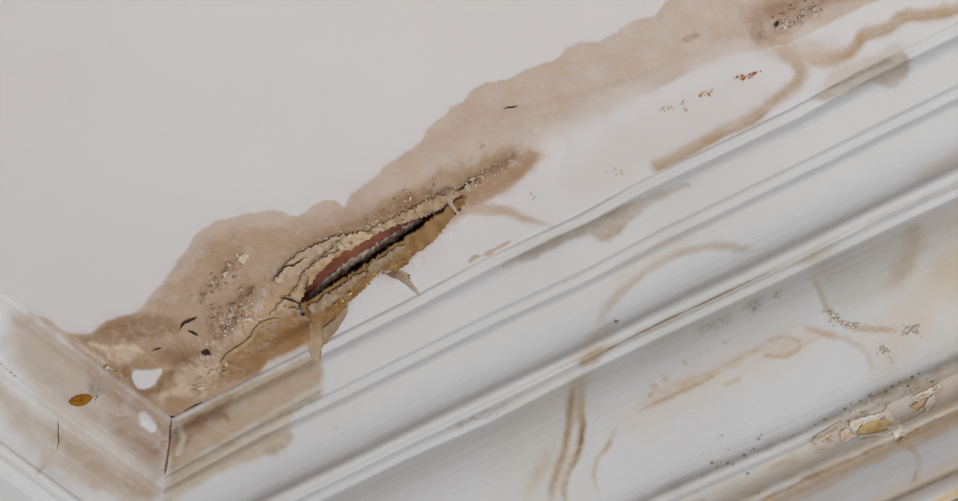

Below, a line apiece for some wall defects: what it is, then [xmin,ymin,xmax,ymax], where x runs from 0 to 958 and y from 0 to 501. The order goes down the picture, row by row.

flaking render [189,253,254,332]
flaking render [269,154,517,362]
crack [180,317,278,367]
corrosion [69,394,93,406]
crack [162,396,215,501]
flaking render [813,382,941,451]